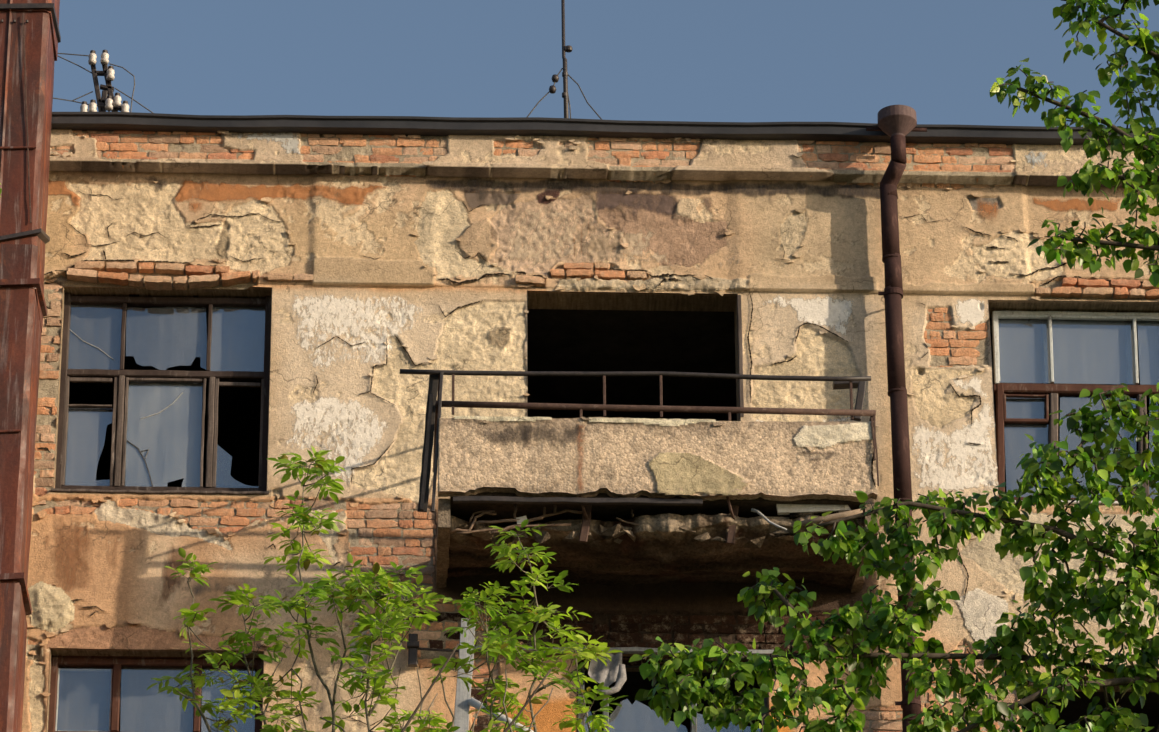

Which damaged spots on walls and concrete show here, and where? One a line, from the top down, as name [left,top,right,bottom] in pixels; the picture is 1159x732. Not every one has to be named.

flaking render [50,130,448,178]
crack [44,191,285,275]
peeling [411,135,750,296]
peeling [780,207,807,263]
crack [902,214,1111,286]
peeling [751,294,860,422]
peeling [907,299,998,492]
peeling [26,181,530,732]
spalling [450,505,583,534]
flaking render [517,610,859,666]